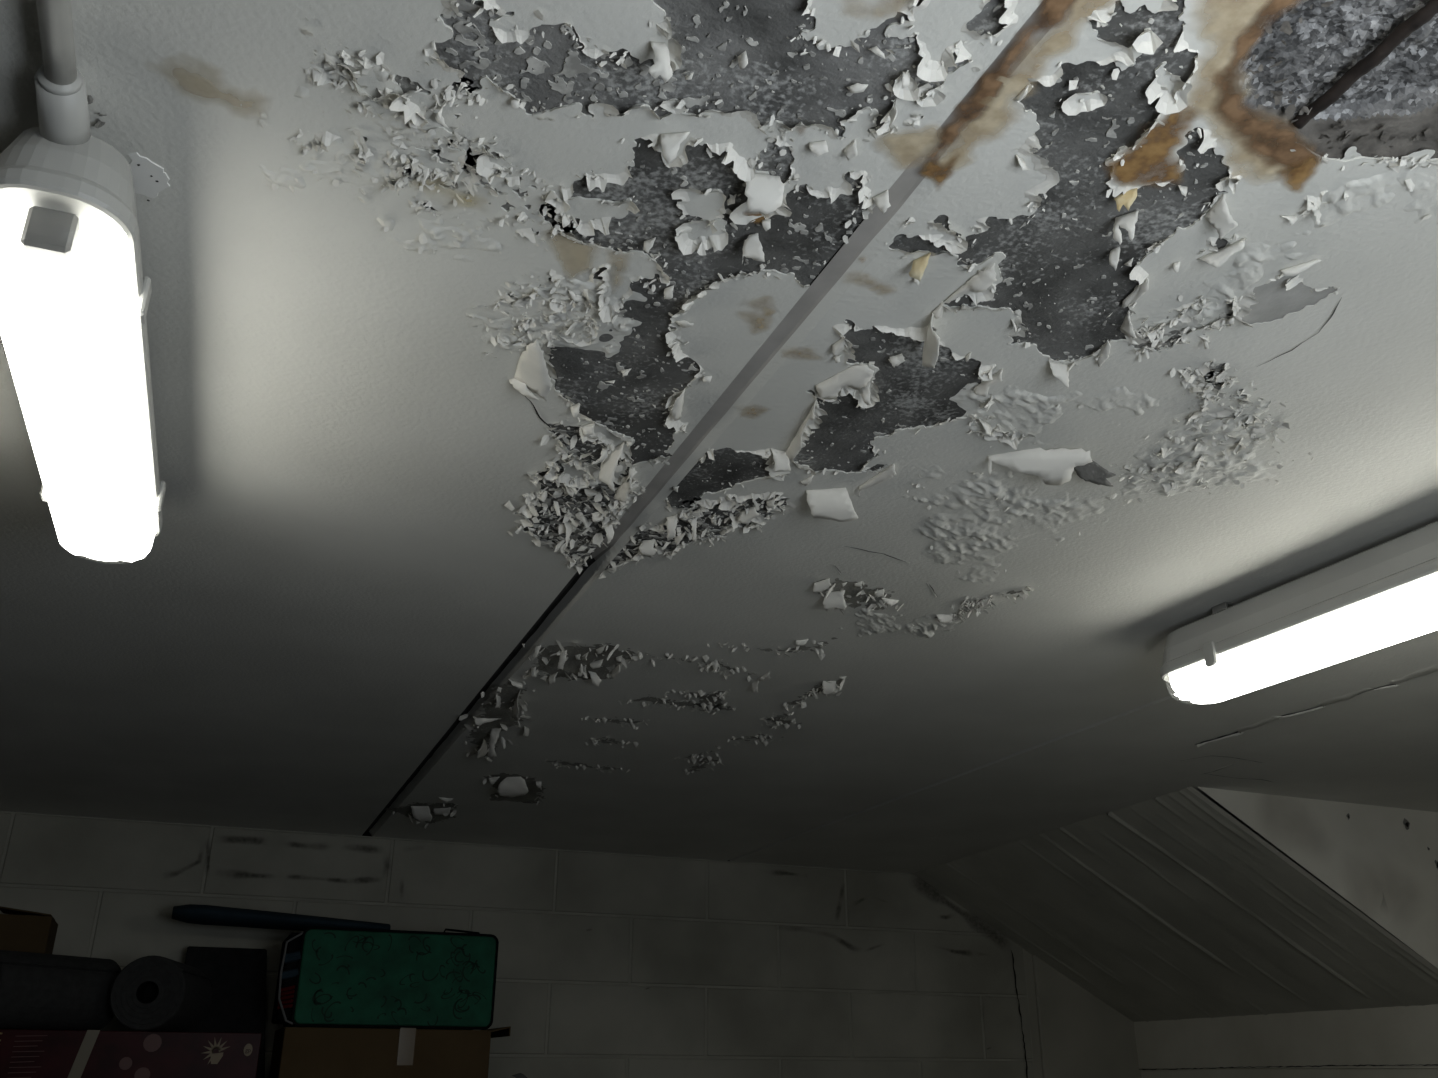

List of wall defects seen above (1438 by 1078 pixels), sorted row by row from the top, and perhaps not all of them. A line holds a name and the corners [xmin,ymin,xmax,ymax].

rust [884,0,1109,184]
spalling [1237,0,1438,226]
peeling [290,0,1340,579]
peeling [459,637,847,806]
crack [1195,664,1438,747]
crack [1011,951,1028,1078]